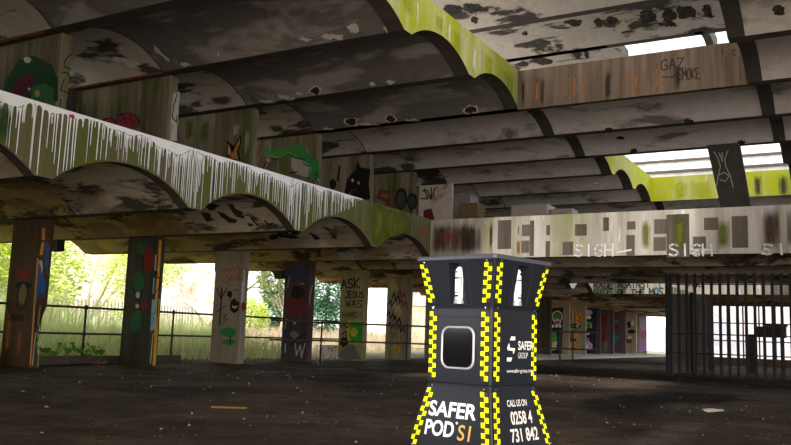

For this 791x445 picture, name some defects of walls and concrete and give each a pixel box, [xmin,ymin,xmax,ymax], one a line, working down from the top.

leakage [0,107,9,136]